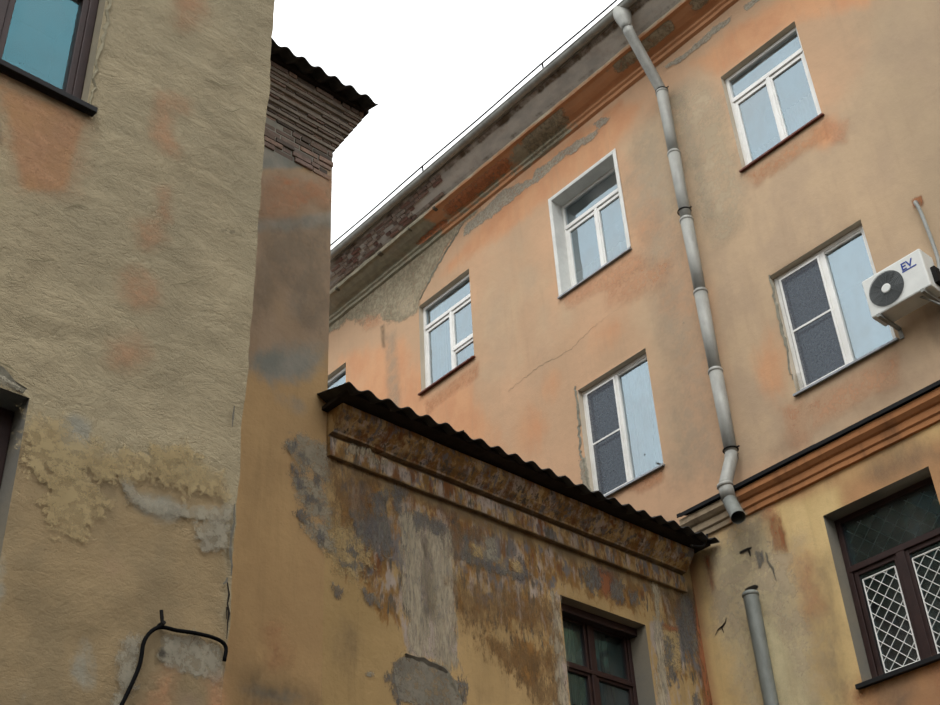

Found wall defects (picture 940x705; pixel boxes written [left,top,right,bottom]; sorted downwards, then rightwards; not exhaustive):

peeling [613,20,674,73]
peeling [329,108,609,332]
peeling [22,414,232,552]
crack [223,504,235,639]
peeling [284,433,531,615]
peeling [157,634,224,682]
flaking render [384,653,468,705]
peeling [662,594,700,688]